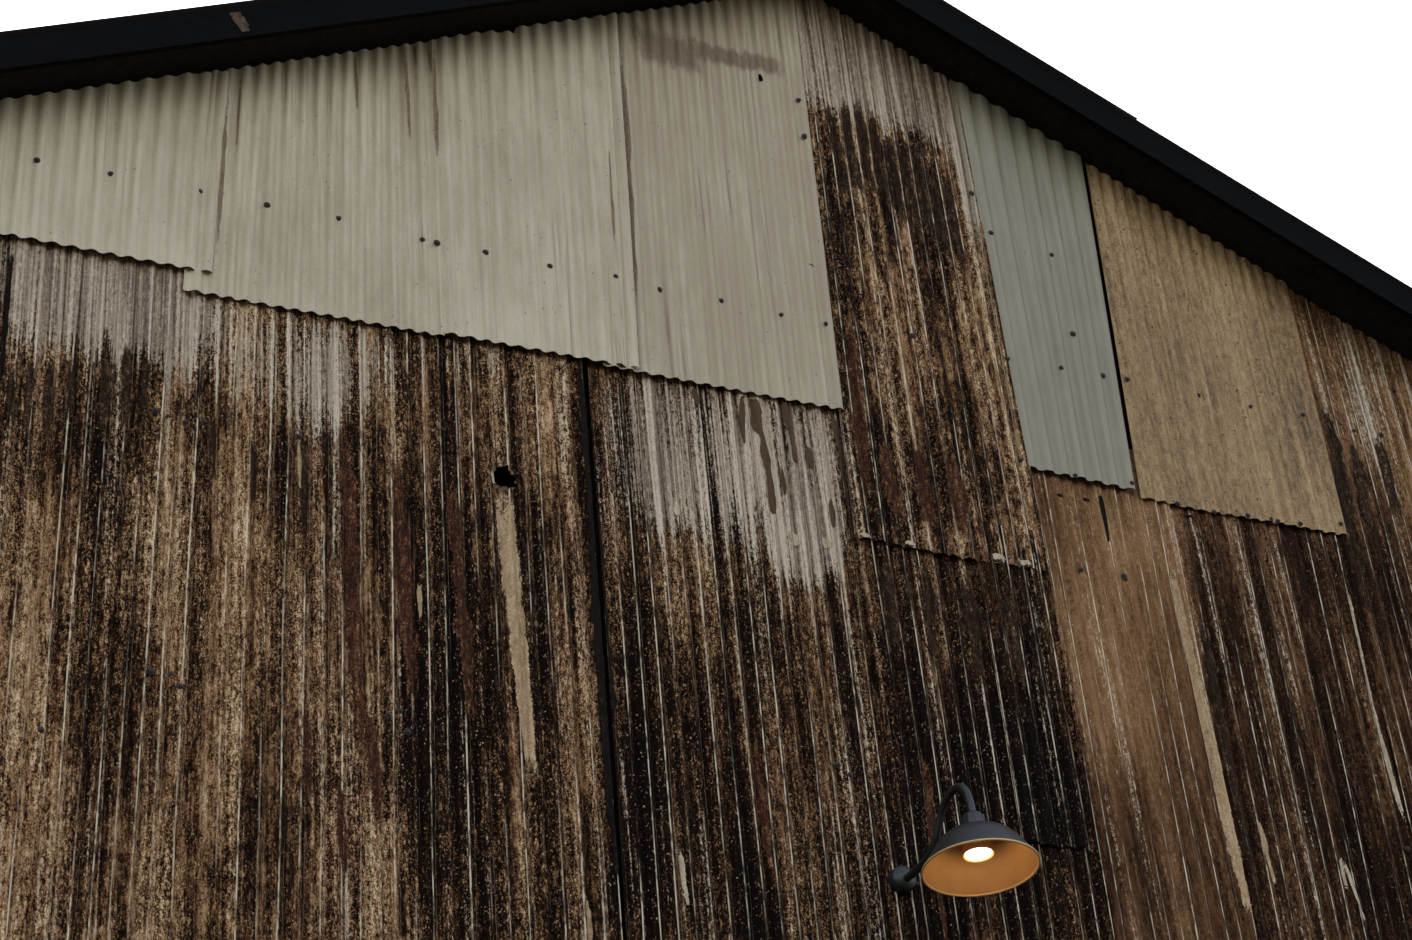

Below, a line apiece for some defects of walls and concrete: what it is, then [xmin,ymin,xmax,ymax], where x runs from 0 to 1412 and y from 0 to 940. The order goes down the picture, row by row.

corrosion [826,98,969,276]
corrosion [250,443,259,506]
corrosion [337,780,349,878]
corrosion [337,427,382,825]
corrosion [391,455,420,706]
corrosion [446,479,477,728]
corrosion [575,362,625,887]
corrosion [753,750,777,890]
corrosion [846,322,969,539]
corrosion [1099,496,1110,542]
corrosion [1197,614,1243,827]
corrosion [1322,407,1403,578]